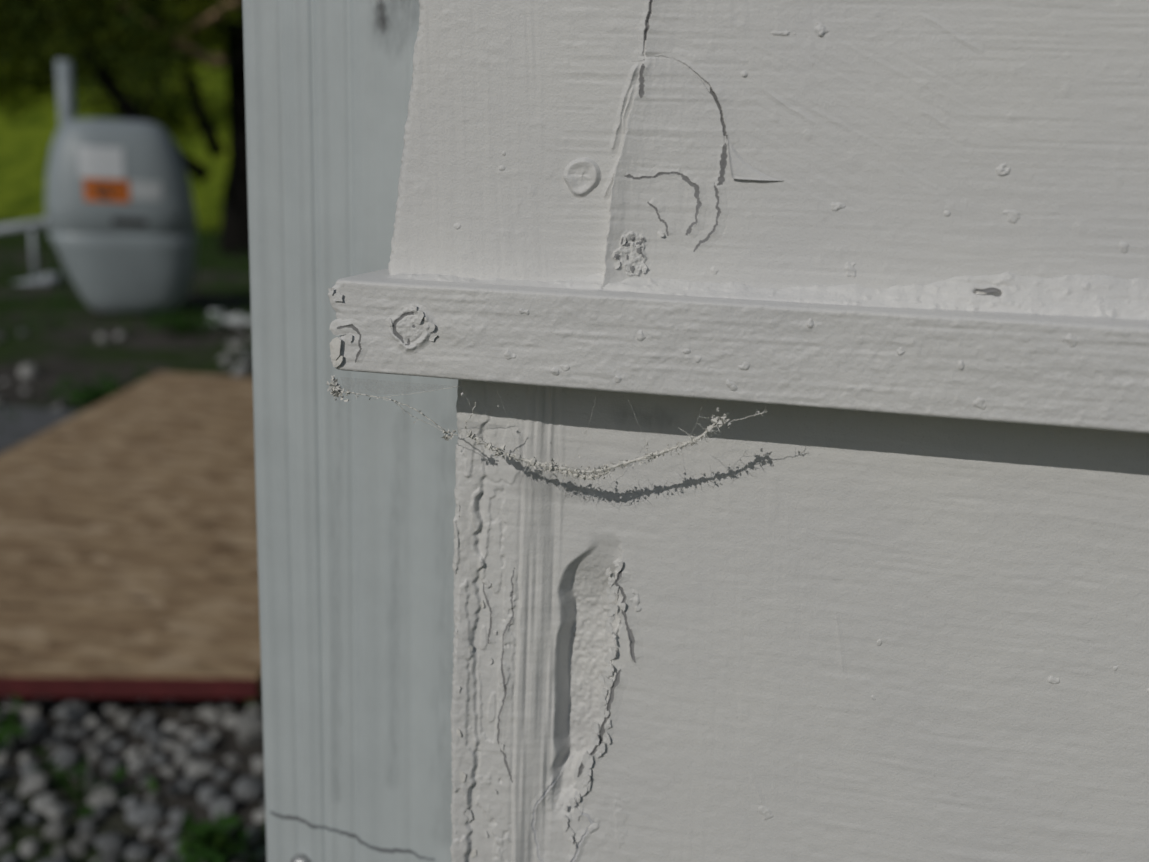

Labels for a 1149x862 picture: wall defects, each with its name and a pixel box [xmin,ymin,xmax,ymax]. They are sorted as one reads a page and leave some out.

crack [615,0,740,259]
peeling [552,545,644,849]
crack [269,809,437,862]